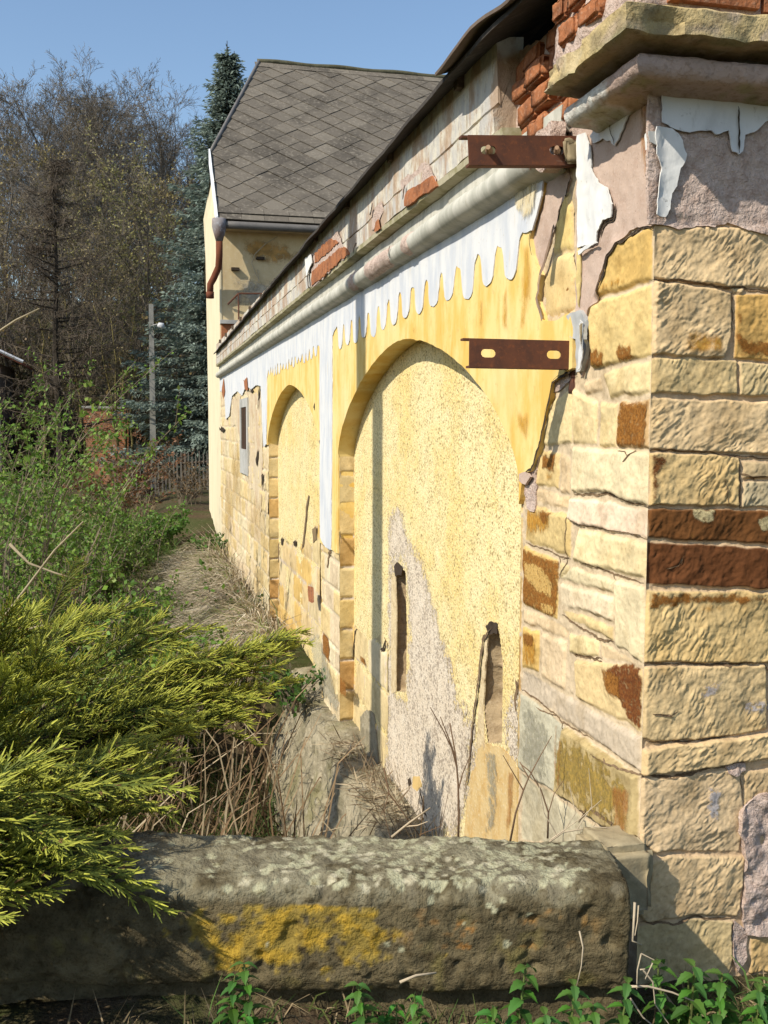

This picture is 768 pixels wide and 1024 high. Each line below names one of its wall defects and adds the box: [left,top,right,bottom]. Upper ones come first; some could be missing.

flaking render [512,0,606,135]
flaking render [400,161,439,207]
flaking render [305,231,350,288]
flaking render [519,94,768,512]
peeling [384,507,519,842]